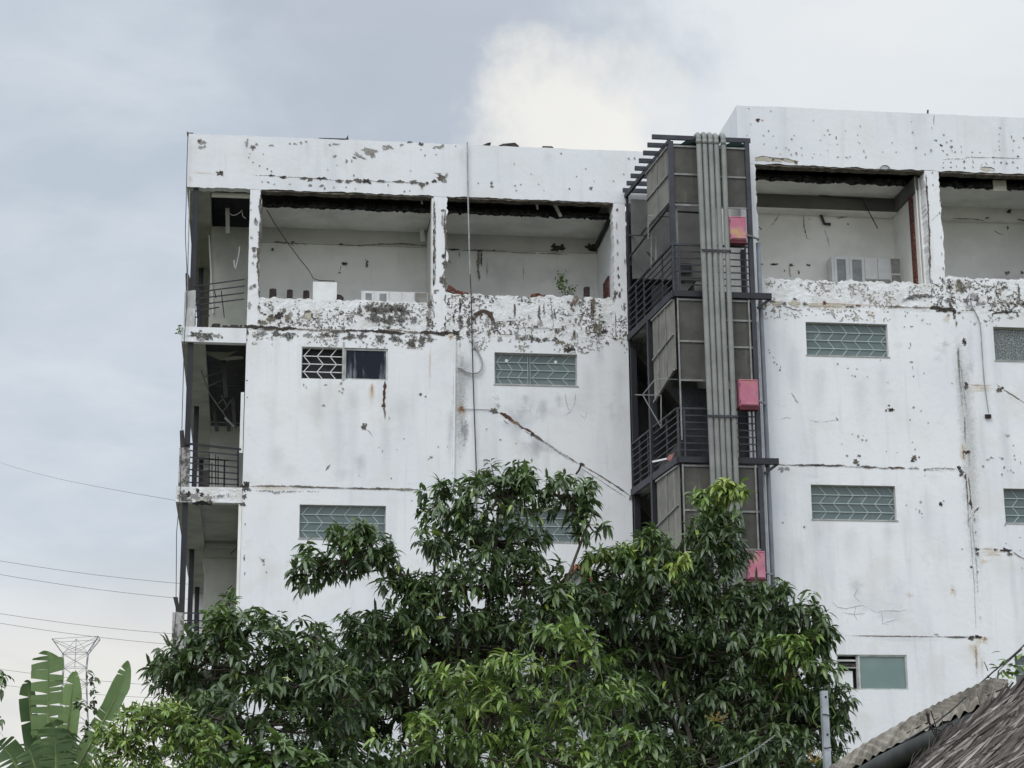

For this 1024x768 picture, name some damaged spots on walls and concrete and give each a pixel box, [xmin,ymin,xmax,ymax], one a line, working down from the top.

peeling [309,141,456,190]
spalling [247,195,627,354]
spalling [746,110,866,164]
flaking render [756,127,1024,328]
crack [490,407,632,500]
crack [777,463,982,640]